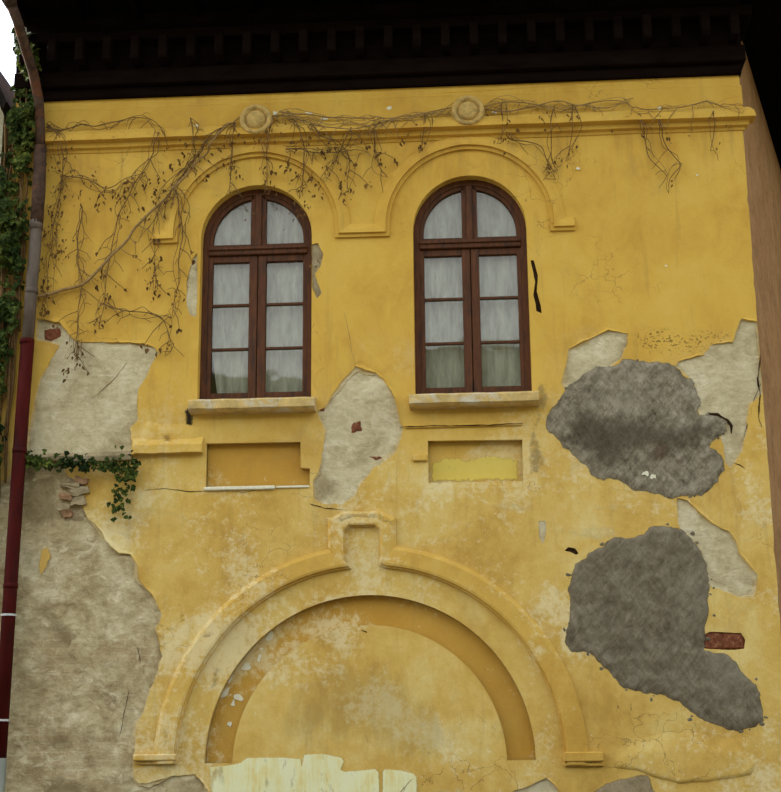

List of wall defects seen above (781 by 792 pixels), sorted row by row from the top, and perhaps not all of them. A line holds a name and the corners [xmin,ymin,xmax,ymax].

flaking render [186,255,198,317]
flaking render [311,244,323,298]
flaking render [27,316,160,456]
flaking render [313,364,403,505]
flaking render [561,327,629,389]
flaking render [675,317,763,468]
flaking render [0,475,11,632]
flaking render [677,498,758,598]
flaking render [5,465,211,792]
peeling [221,676,243,706]
flaking render [704,632,745,650]
flaking render [513,777,559,792]